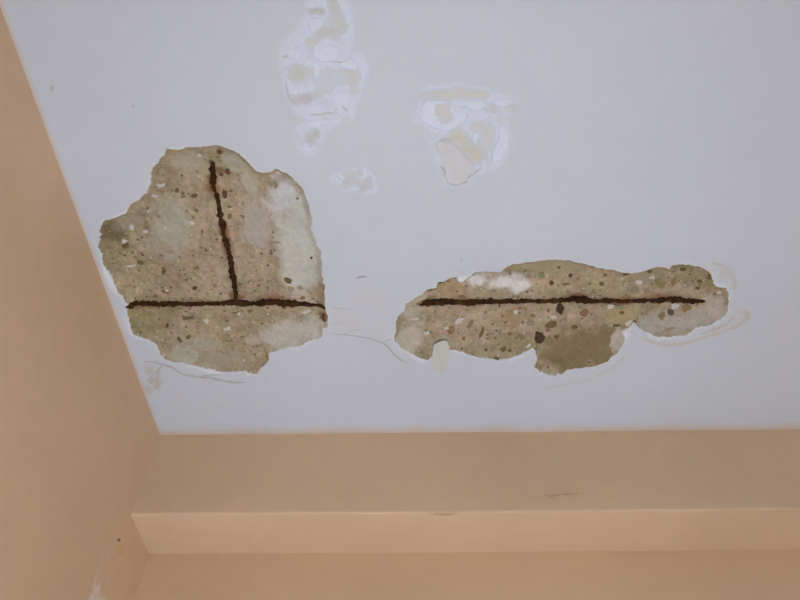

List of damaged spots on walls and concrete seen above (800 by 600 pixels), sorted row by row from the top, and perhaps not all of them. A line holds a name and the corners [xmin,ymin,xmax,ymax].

spalling [88,135,335,381]
spalling [386,252,752,389]